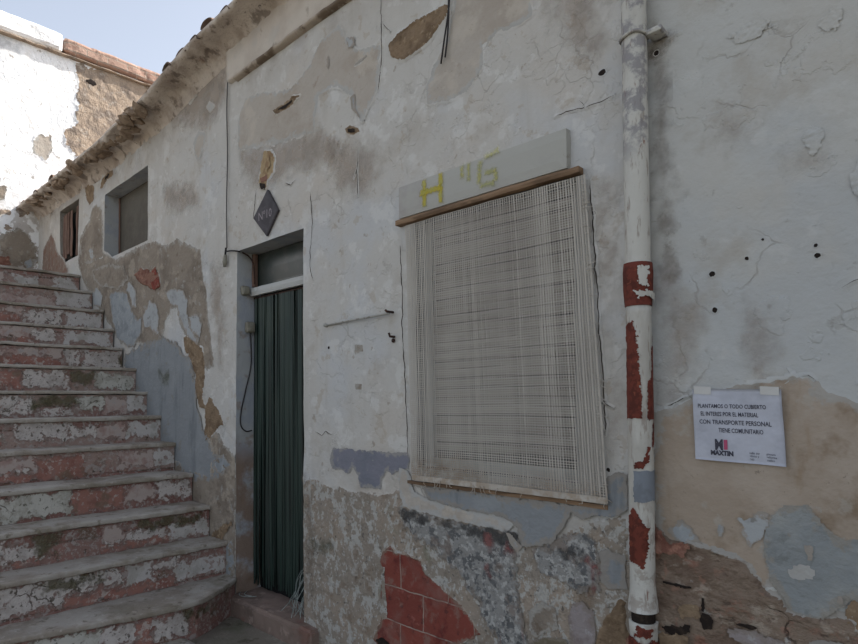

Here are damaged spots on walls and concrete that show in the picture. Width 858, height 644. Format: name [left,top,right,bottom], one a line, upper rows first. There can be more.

peeling [237,0,535,191]
crack [553,92,616,120]
peeling [0,61,236,620]
peeling [633,265,655,302]
peeling [303,371,858,644]